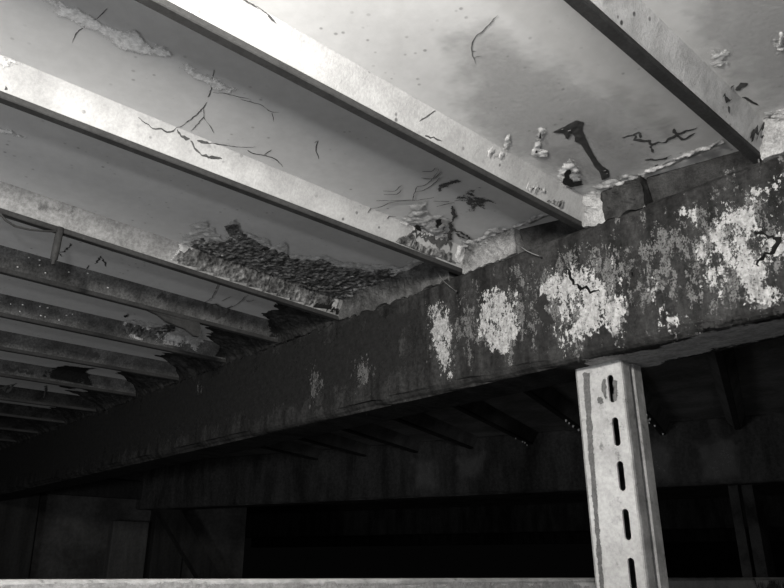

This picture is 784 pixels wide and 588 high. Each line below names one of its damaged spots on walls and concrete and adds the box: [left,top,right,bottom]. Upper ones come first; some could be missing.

crack [471,17,496,63]
crack [138,72,283,167]
crack [419,111,441,141]
spalling [531,120,619,194]
crack [622,128,696,166]
crack [368,169,473,250]
spalling [171,219,402,305]
crack [754,230,782,266]
spalling [124,313,206,351]
damp [0,155,784,490]